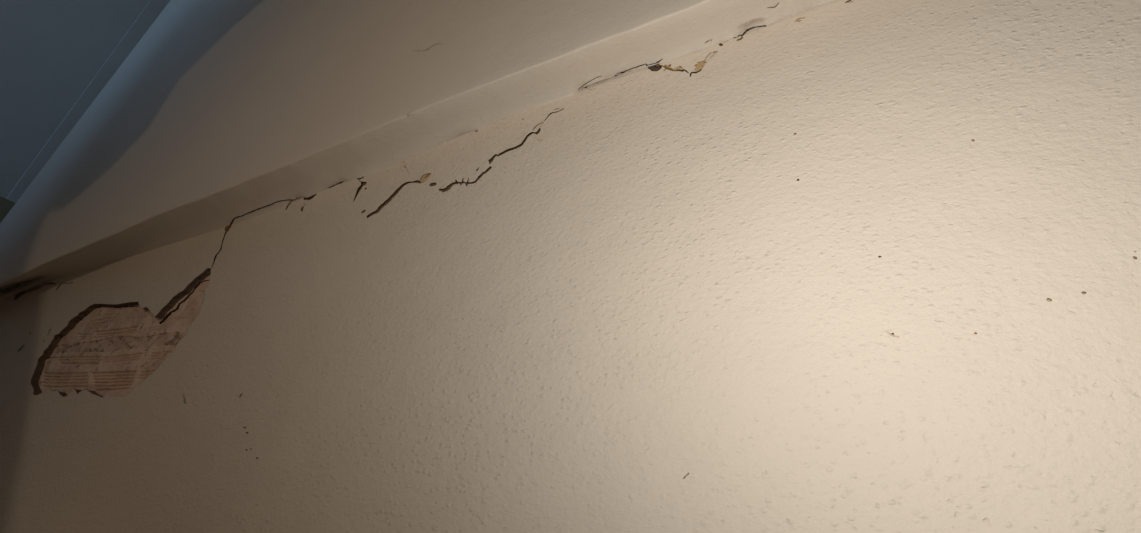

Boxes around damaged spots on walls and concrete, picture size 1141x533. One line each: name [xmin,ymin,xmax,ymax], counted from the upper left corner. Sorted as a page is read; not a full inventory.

crack [212,25,766,267]
spalling [31,268,211,397]